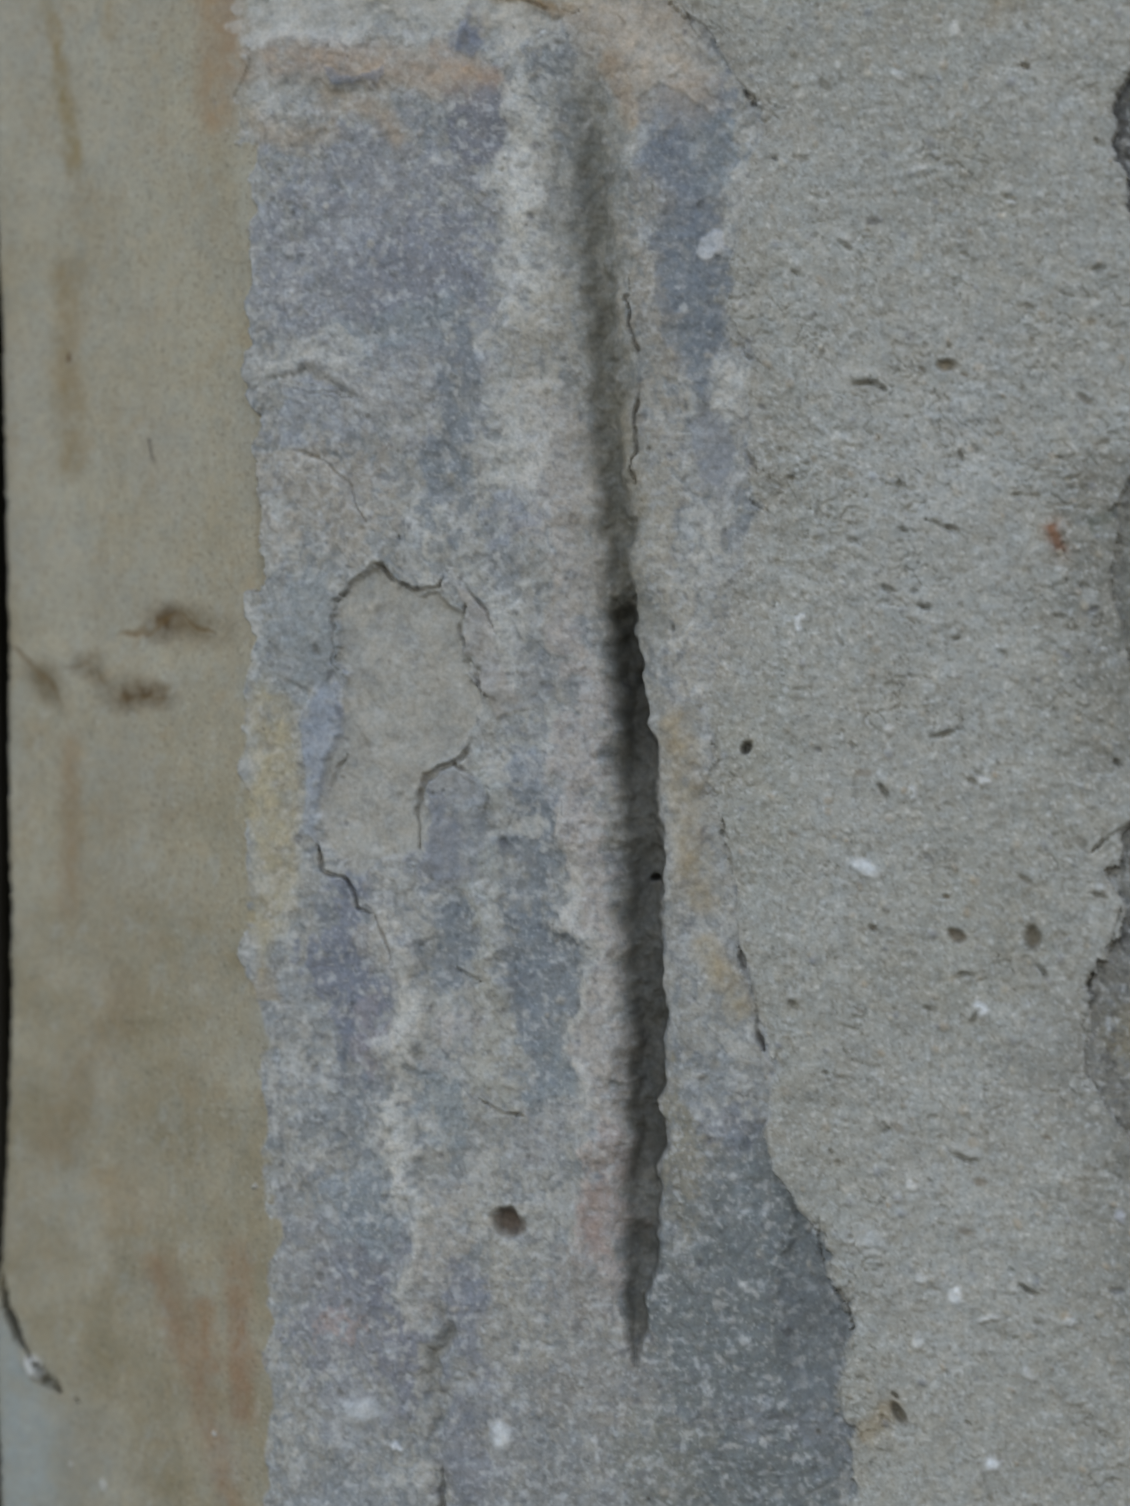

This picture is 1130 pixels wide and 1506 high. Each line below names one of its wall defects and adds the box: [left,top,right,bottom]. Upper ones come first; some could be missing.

spalling [237,0,577,61]
crack [516,0,583,16]
crack [673,0,704,42]
corrosion [181,0,507,158]
crack [742,87,759,108]
peeling [631,80,744,491]
crack [622,269,648,529]
spalling [257,560,530,897]
spalling [738,739,757,757]
spalling [648,873,663,883]
spalling [486,1205,530,1242]
spalling [773,1193,859,1486]